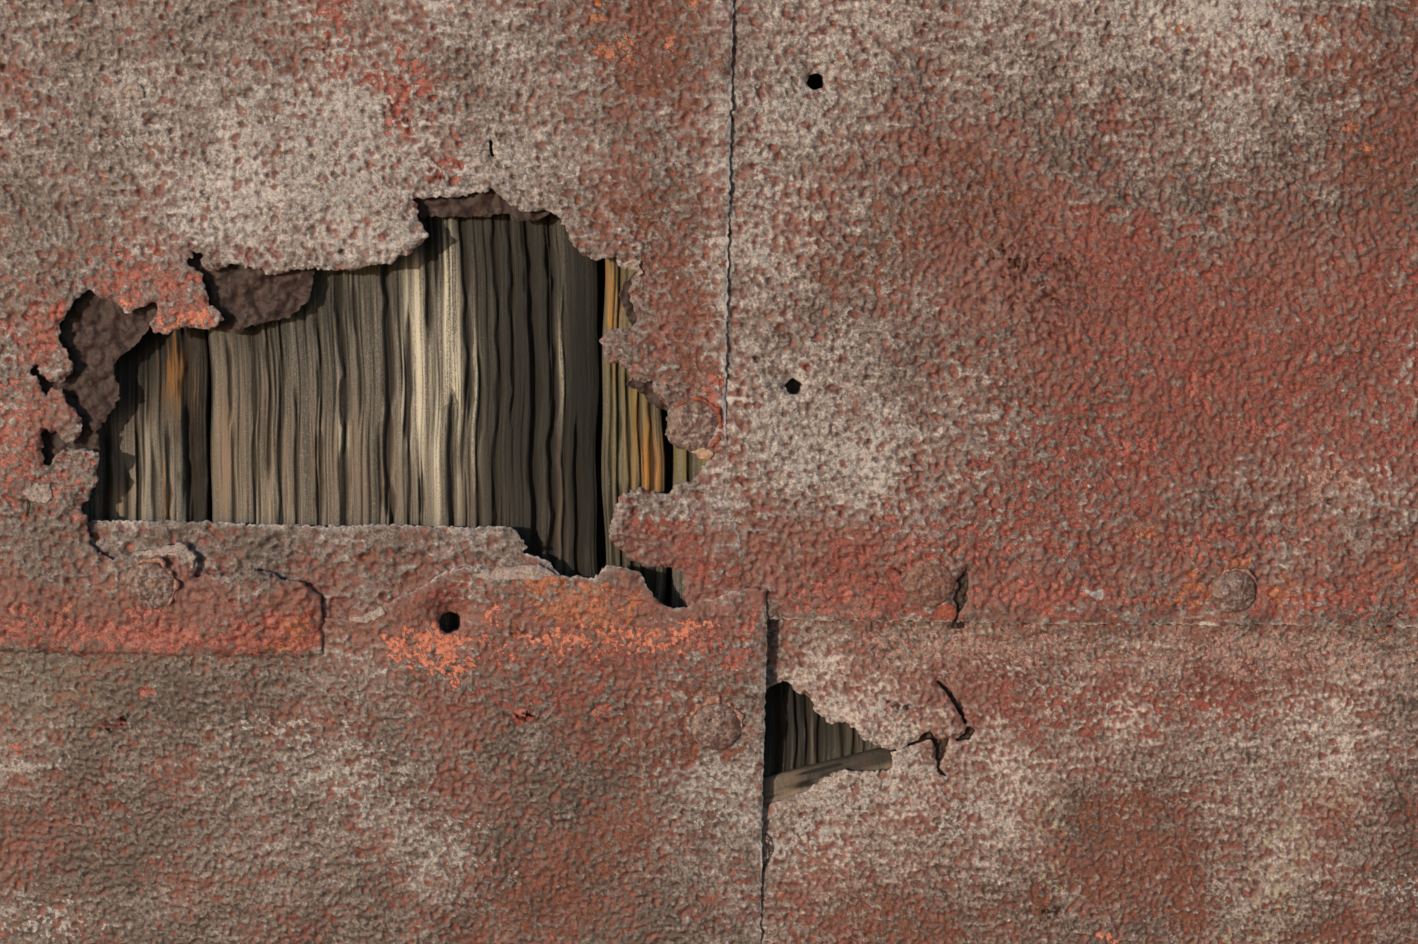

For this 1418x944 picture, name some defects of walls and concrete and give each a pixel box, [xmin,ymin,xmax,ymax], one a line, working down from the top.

rust [575,0,730,454]
rust [629,0,1418,760]
rust [0,595,321,656]
rust [379,575,760,944]
crack [885,681,975,776]
rust [1272,904,1409,944]